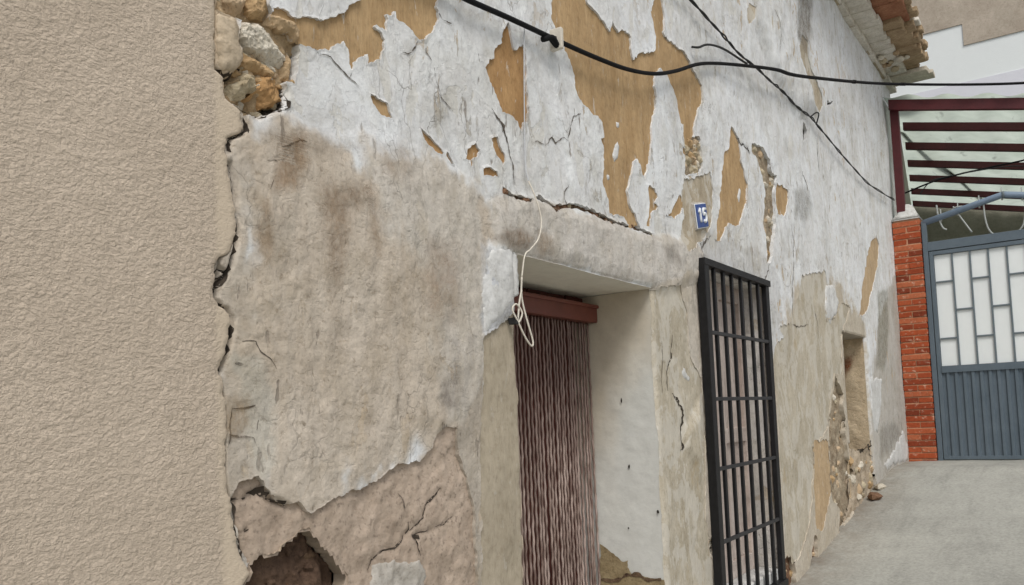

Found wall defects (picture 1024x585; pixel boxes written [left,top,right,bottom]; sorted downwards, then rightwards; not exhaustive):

crack [215,69,240,82]
flaking render [214,0,441,121]
crack [492,109,579,195]
flaking render [419,0,789,266]
flaking render [798,31,834,116]
flaking render [230,249,523,585]
crack [661,335,684,450]
flaking render [773,232,908,585]
crack [368,488,446,568]